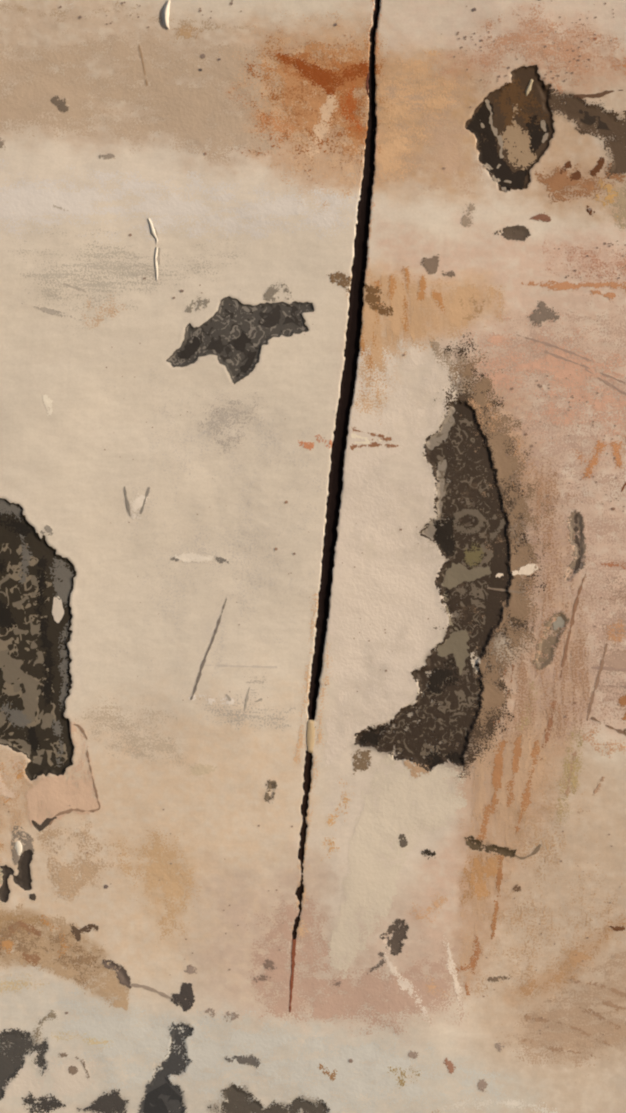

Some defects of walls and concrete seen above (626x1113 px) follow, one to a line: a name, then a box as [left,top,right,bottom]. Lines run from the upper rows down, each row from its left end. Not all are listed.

peeling [166,282,314,384]
crack [308,0,380,721]
rust [216,0,626,451]
peeling [465,65,626,192]
peeling [0,498,101,905]
crack [289,751,313,1012]
rust [291,593,351,939]
peeling [307,332,570,780]
rust [408,397,626,995]
peeling [564,509,586,581]
peeling [0,1010,57,1100]